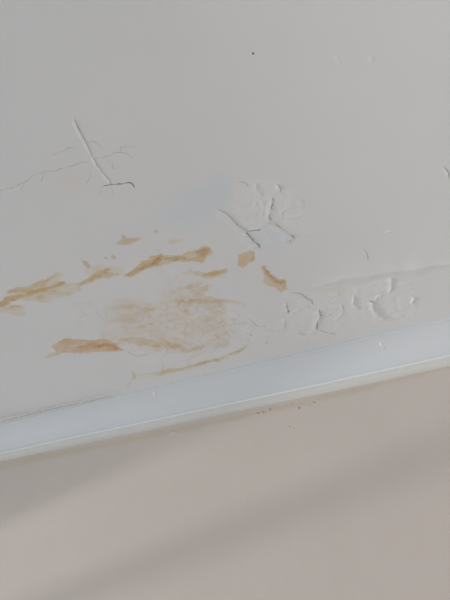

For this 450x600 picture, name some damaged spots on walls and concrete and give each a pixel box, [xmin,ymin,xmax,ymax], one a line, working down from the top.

crack [5,117,134,195]